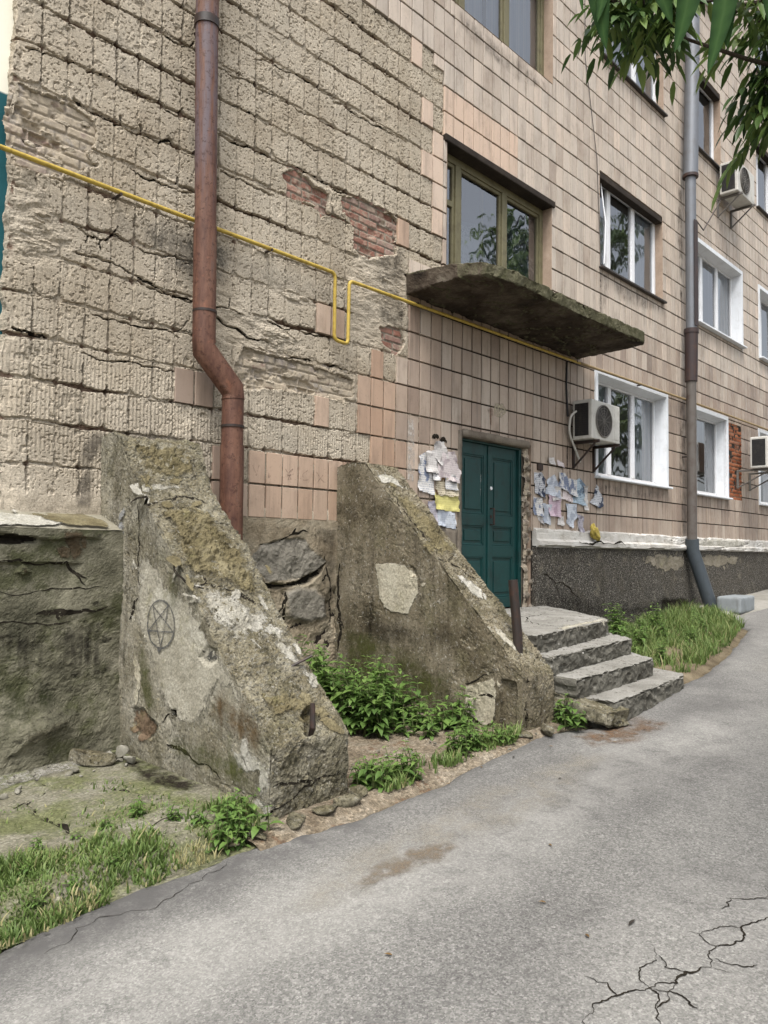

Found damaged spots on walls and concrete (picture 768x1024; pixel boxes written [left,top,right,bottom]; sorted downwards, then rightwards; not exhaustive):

spalling [2,79,96,260]
spalling [282,165,398,259]
crack [77,228,342,372]
spalling [230,319,352,402]
spalling [379,325,403,355]
spalling [725,422,742,501]
crack [0,495,211,625]
flaking render [375,563,426,614]
flaking render [130,538,326,741]
crack [162,711,221,780]
damp [370,846,451,883]
crack [582,888,768,1024]